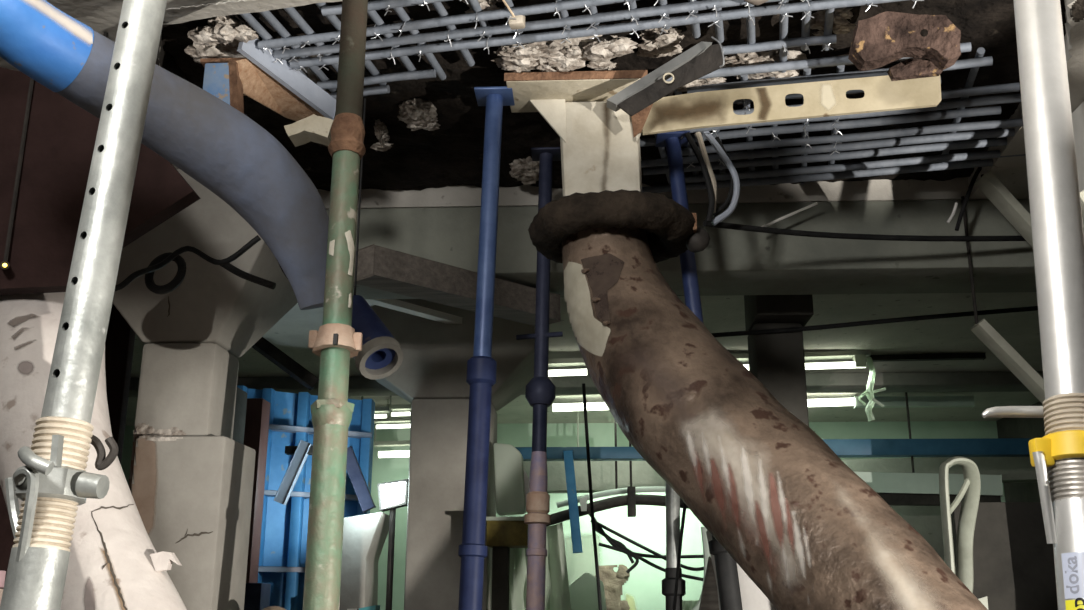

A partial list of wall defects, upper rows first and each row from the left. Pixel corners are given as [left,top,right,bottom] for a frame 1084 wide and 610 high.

spalling [161,1,342,94]
spalling [359,0,1021,191]
rust [848,11,961,81]
spalling [243,96,333,192]
crack [91,504,134,610]
crack [176,529,213,543]